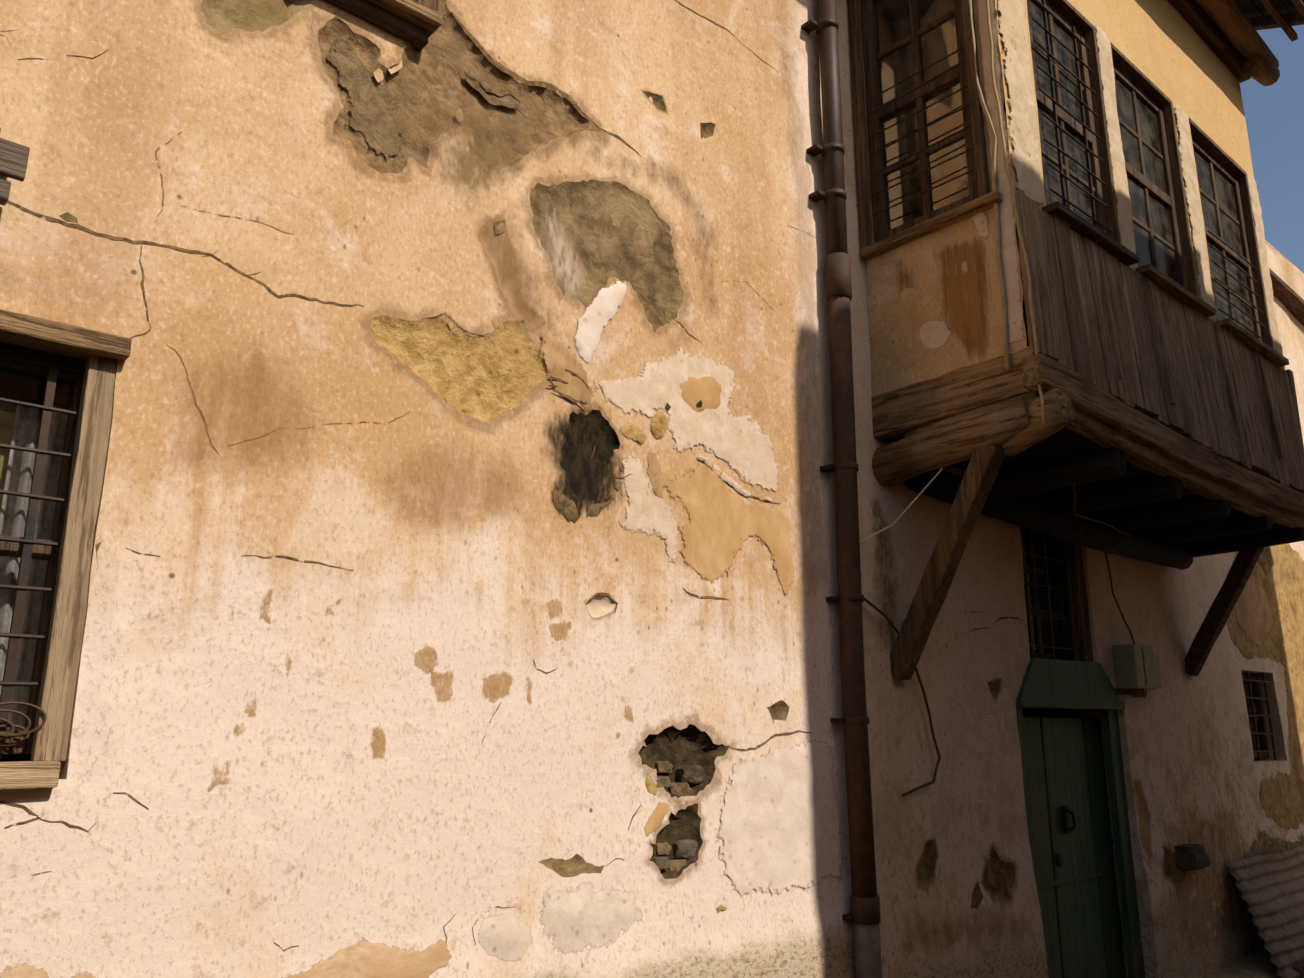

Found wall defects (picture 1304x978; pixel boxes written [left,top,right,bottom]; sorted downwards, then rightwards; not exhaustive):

flaking render [318,0,602,173]
flaking render [642,91,666,112]
flaking render [700,122,716,139]
crack [7,132,410,454]
flaking render [370,179,795,596]
flaking render [1227,543,1304,859]
flaking render [638,724,843,896]
flaking render [917,840,938,891]
flaking render [970,847,1016,910]
flaking render [0,963,48,978]
flaking render [289,938,452,978]